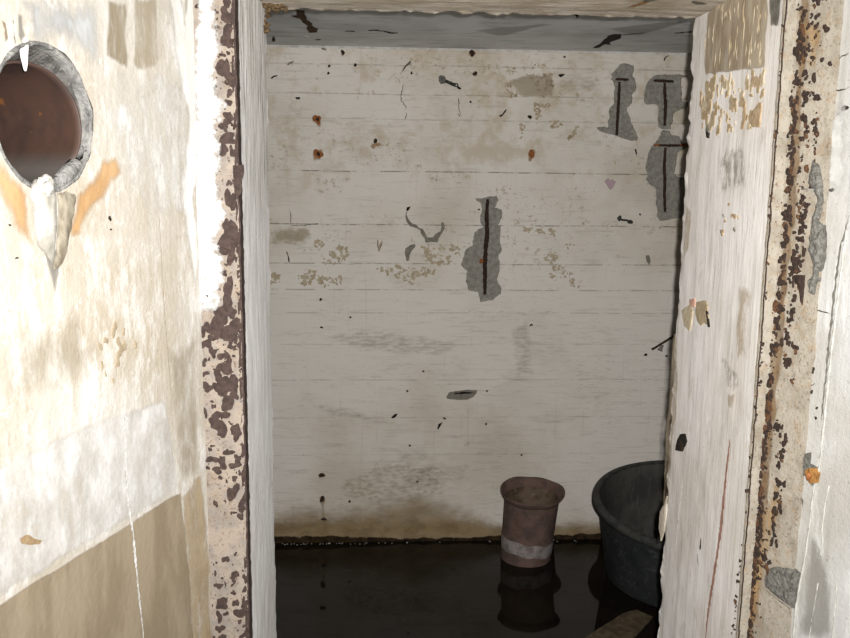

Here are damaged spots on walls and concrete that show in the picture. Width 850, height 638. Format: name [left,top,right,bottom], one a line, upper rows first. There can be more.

peeling [700,0,768,138]
spalling [597,63,689,221]
rust [0,167,27,234]
rust [72,160,119,234]
spalling [376,196,502,302]
spalling [801,161,827,295]
rust [745,0,832,638]
spalling [446,390,488,400]
damp [274,506,502,543]
spalling [765,566,801,608]